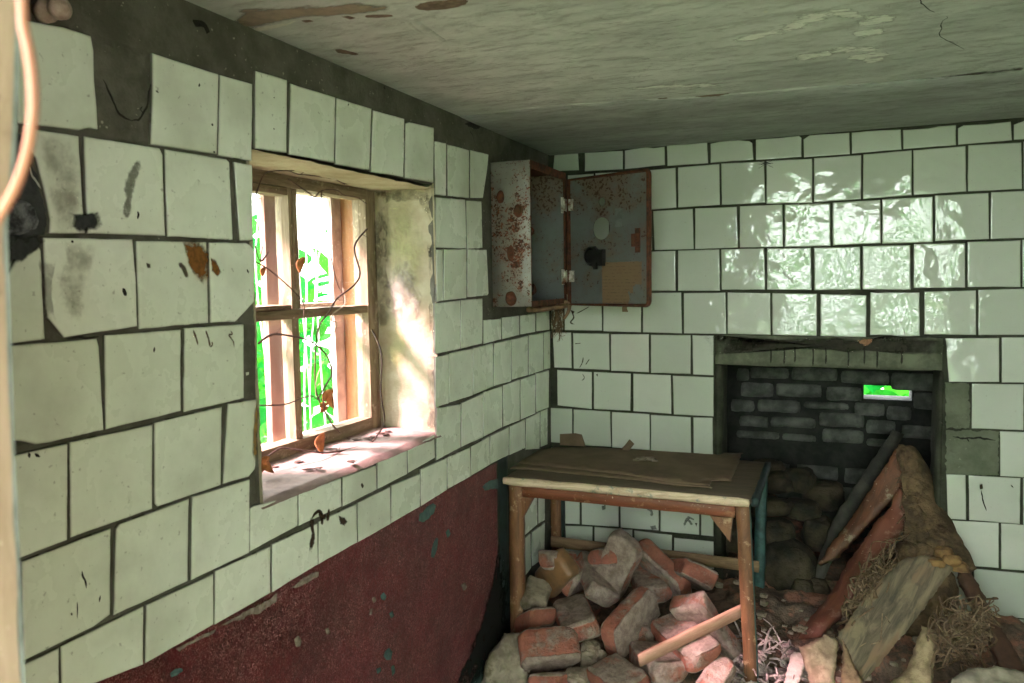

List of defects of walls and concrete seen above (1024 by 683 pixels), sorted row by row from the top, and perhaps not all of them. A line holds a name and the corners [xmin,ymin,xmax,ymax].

flaking render [236,4,392,31]
flaking render [415,0,468,11]
crack [920,0,962,48]
peeling [94,35,159,142]
spalling [8,133,47,255]
corrosion [179,241,221,282]
leakage [375,213,390,287]
peeling [945,382,999,476]
peeling [176,592,277,651]